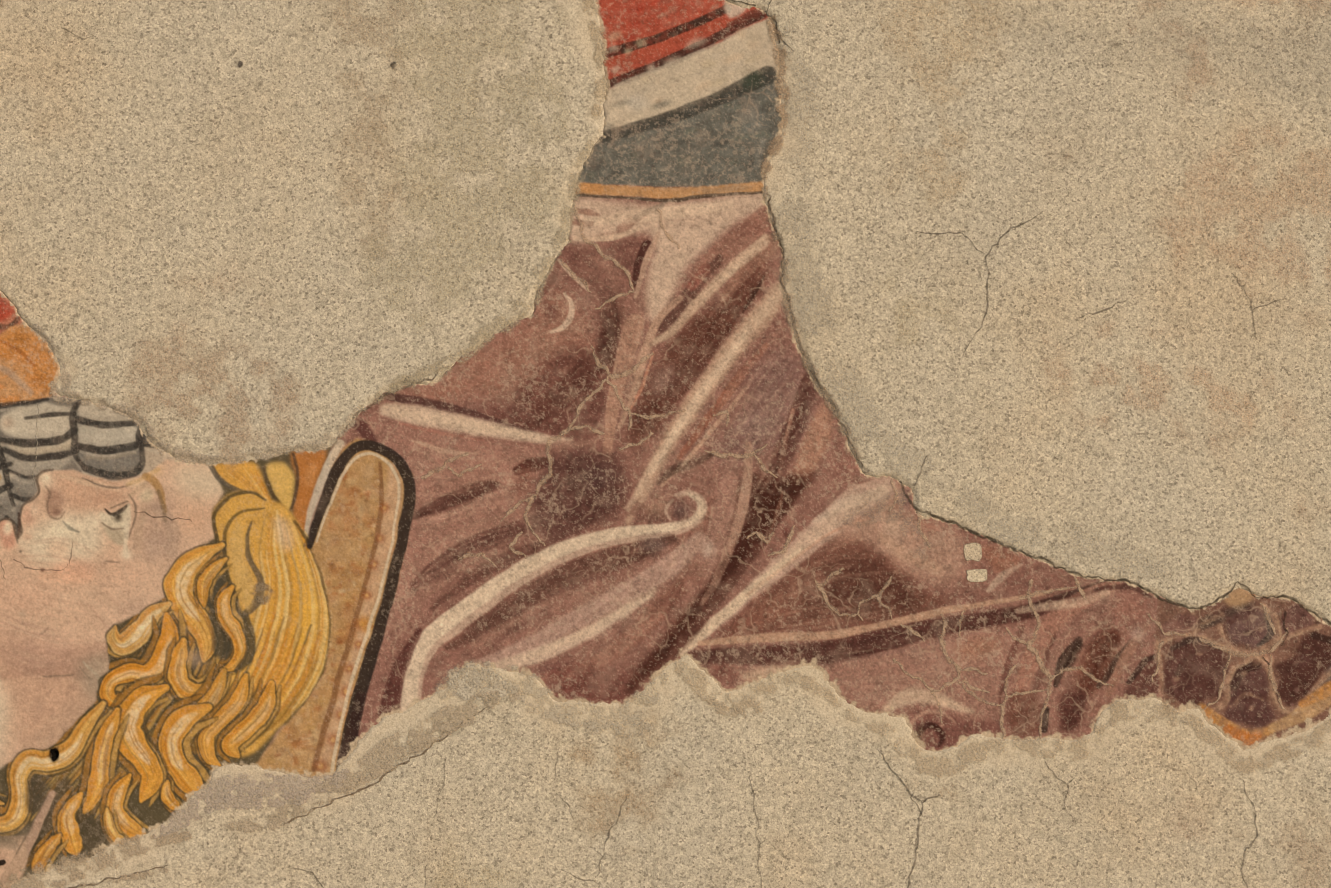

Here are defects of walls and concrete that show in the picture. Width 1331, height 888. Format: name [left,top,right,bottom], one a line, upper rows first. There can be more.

crack [732,0,788,46]
crack [563,207,634,309]
crack [656,208,680,249]
spalling [50,366,355,464]
crack [458,346,778,567]
crack [768,197,1331,739]
crack [747,525,795,556]
peeling [964,543,987,582]
spalling [228,662,836,832]
spalling [9,832,191,888]
crack [882,754,940,887]